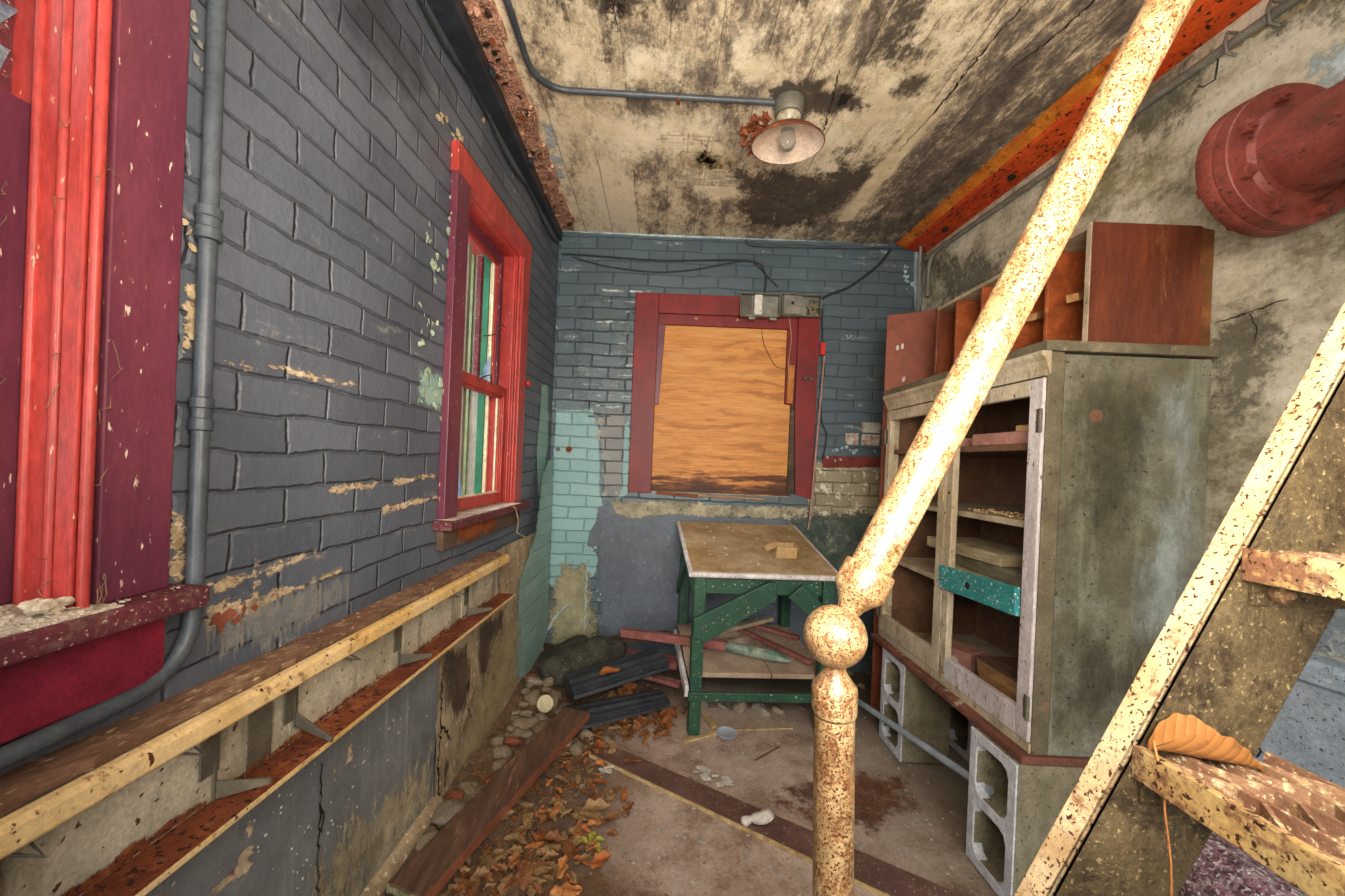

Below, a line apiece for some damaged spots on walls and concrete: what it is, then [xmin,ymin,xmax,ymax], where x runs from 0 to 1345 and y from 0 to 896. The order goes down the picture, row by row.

peeling [190,10,204,72]
leakage [1266,0,1345,37]
peeling [436,112,464,143]
leakage [551,0,983,232]
leakage [1126,56,1203,143]
peeling [426,216,451,284]
peeling [418,302,439,346]
peeling [418,367,444,421]
peeling [328,474,438,516]
peeling [515,289,809,678]
spalling [203,550,343,633]
leakage [441,607,519,788]